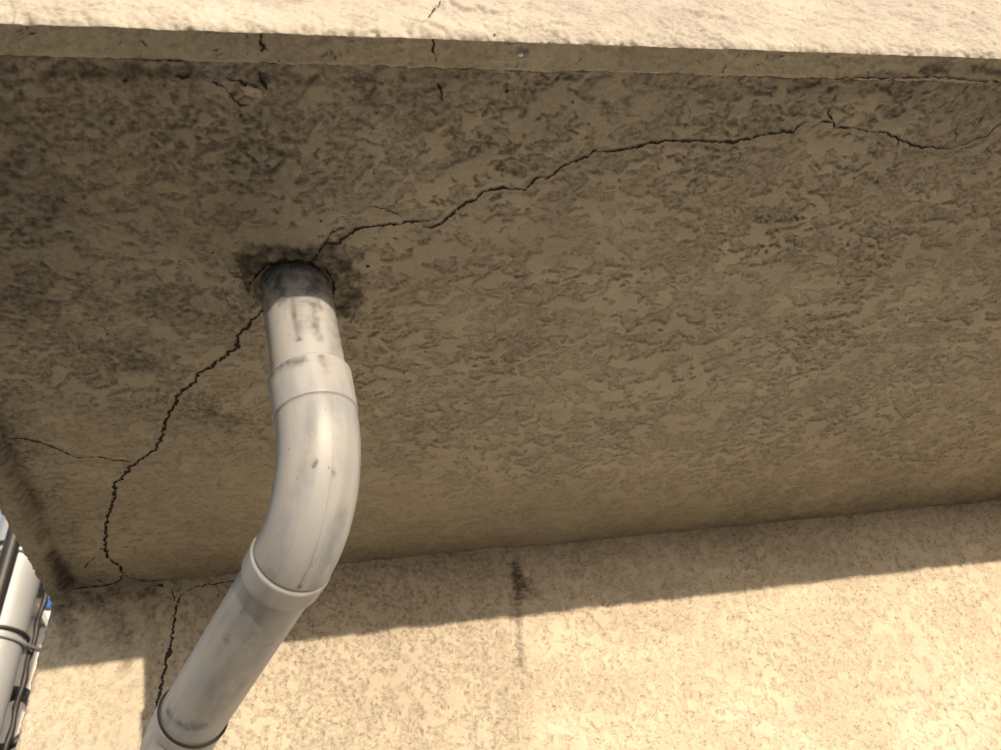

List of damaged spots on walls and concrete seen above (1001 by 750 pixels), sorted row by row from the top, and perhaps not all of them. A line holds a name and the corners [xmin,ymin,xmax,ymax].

crack [1,25,71,58]
crack [107,31,355,107]
crack [374,1,581,101]
crack [610,47,1001,94]
crack [311,108,1001,262]
water stain [228,246,361,318]
crack [15,309,263,715]